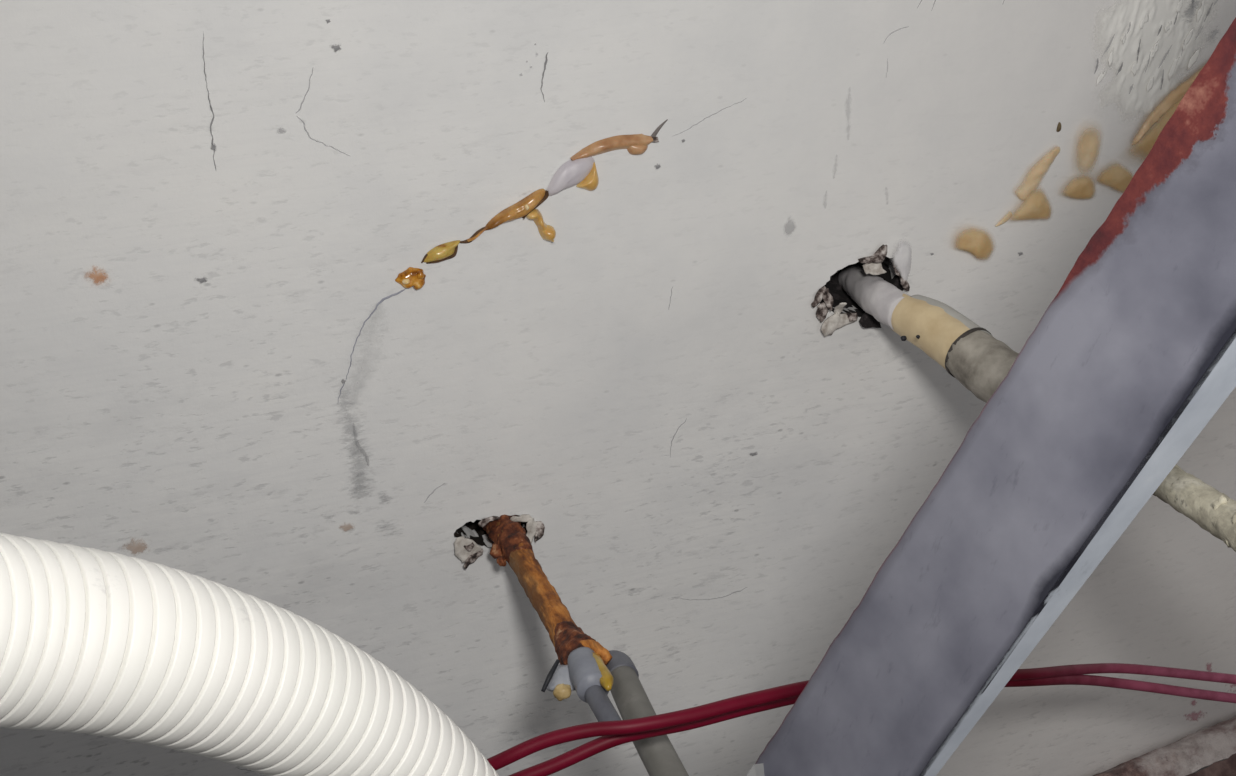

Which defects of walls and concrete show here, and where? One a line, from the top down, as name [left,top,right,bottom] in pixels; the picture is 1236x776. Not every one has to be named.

crack [203,34,216,169]
crack [279,69,350,156]
spalling [811,242,911,337]
crack [338,289,405,399]
spalling [454,514,545,569]